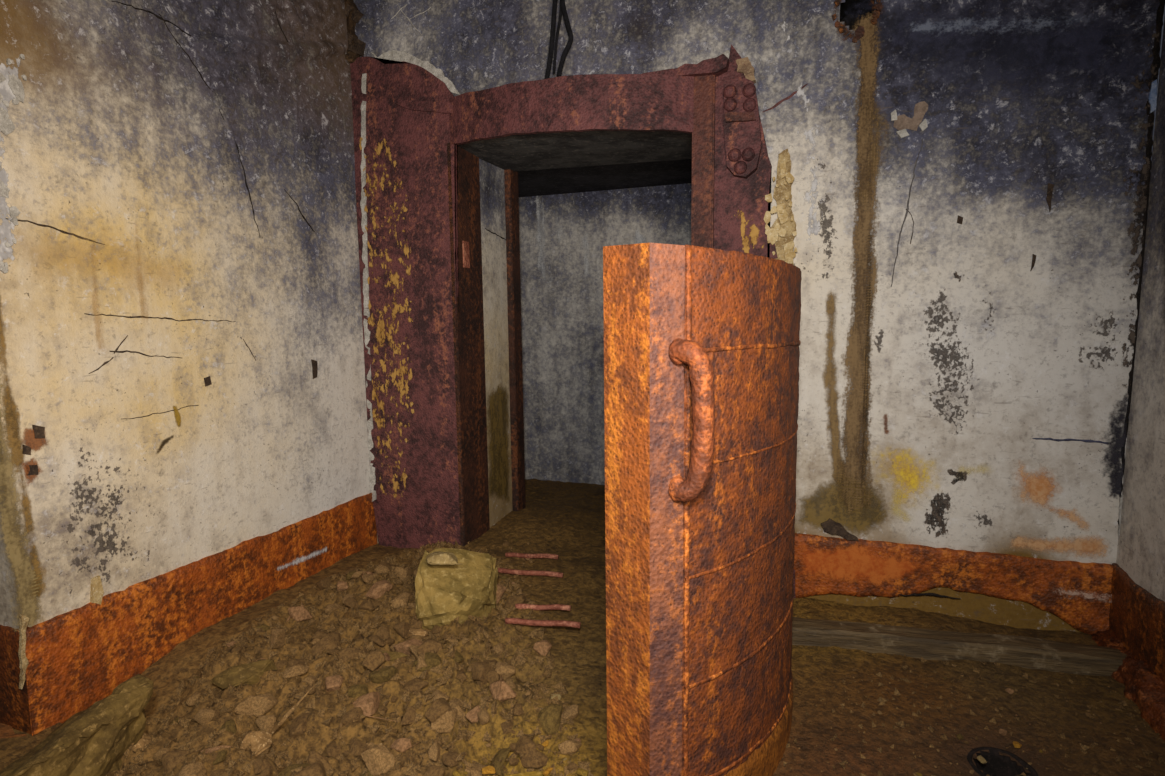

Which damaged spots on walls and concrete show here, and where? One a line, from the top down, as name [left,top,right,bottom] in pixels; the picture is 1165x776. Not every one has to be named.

spalling [832,0,882,43]
peeling [0,54,27,273]
flaking render [734,128,823,265]
leakage [817,195,838,278]
leakage [915,290,979,435]
leakage [0,303,45,627]
leakage [62,439,155,594]